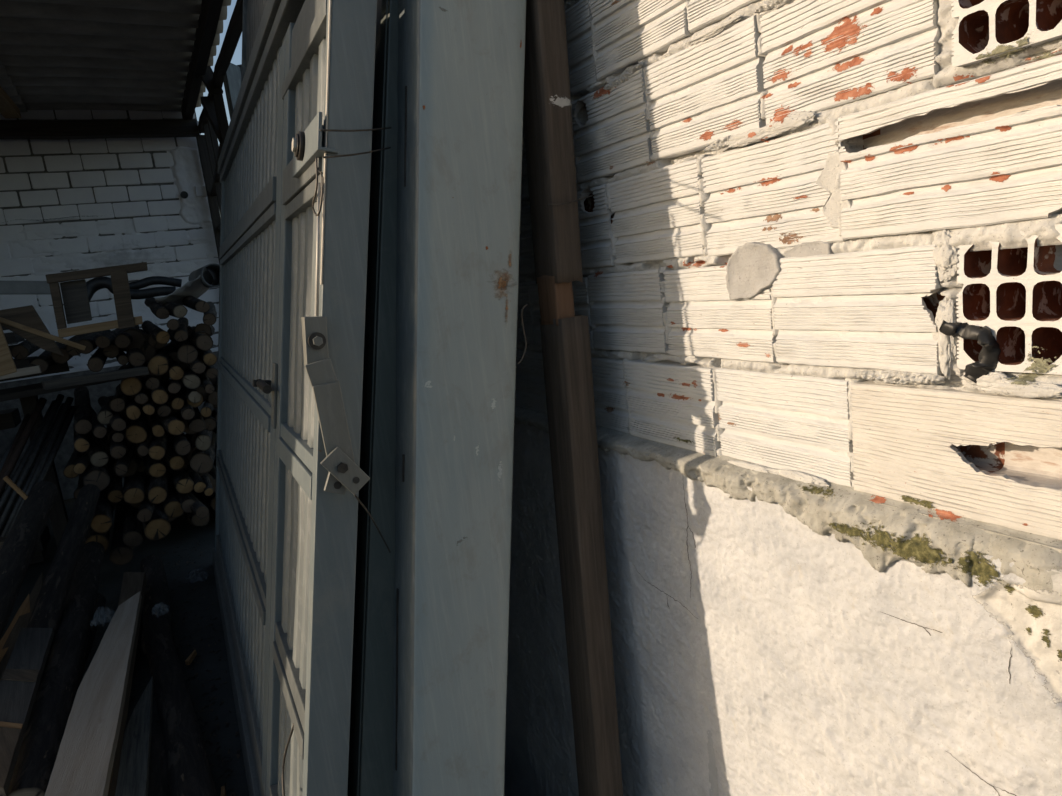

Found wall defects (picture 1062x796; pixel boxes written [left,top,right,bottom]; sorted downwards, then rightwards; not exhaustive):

peeling [781,7,882,72]
peeling [761,68,801,99]
peeling [834,83,875,101]
peeling [885,64,917,84]
spalling [697,105,794,152]